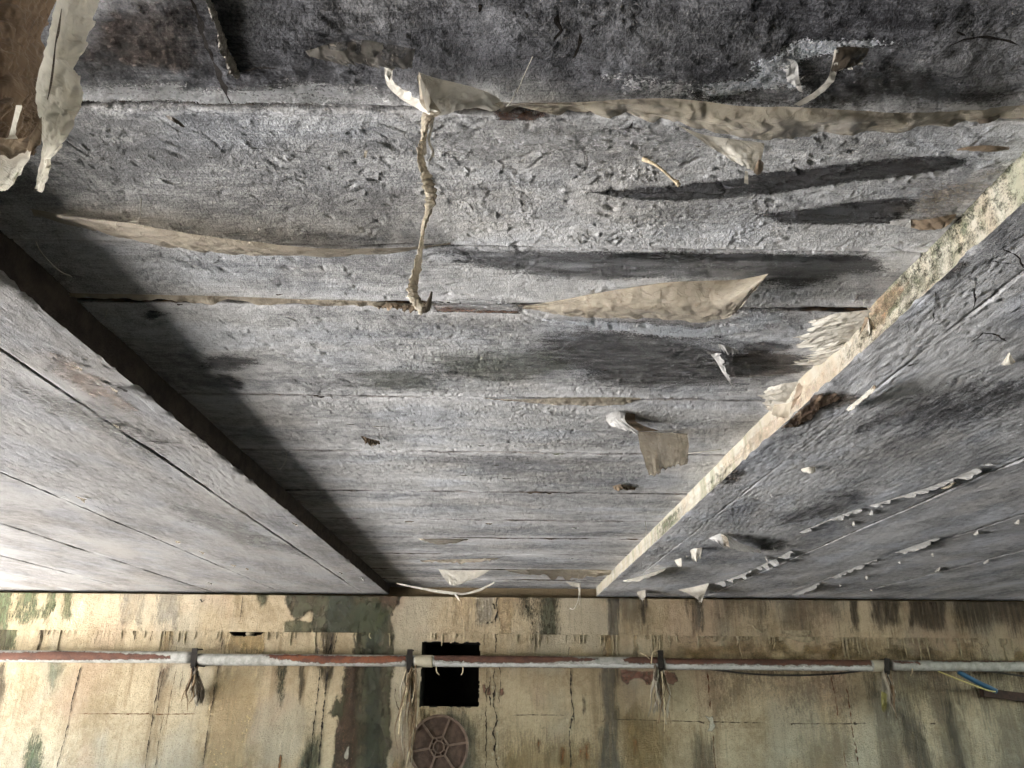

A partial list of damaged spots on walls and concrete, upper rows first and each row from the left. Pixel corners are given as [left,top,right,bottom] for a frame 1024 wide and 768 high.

peeling [799,463,993,533]
peeling [715,546,796,586]
peeling [792,559,877,595]
peeling [892,538,940,573]
leakage [12,593,72,650]
leakage [517,598,561,635]
leakage [606,598,620,635]
leakage [684,599,703,631]
leakage [850,601,859,630]
leakage [871,601,1024,637]
rust [683,638,977,661]